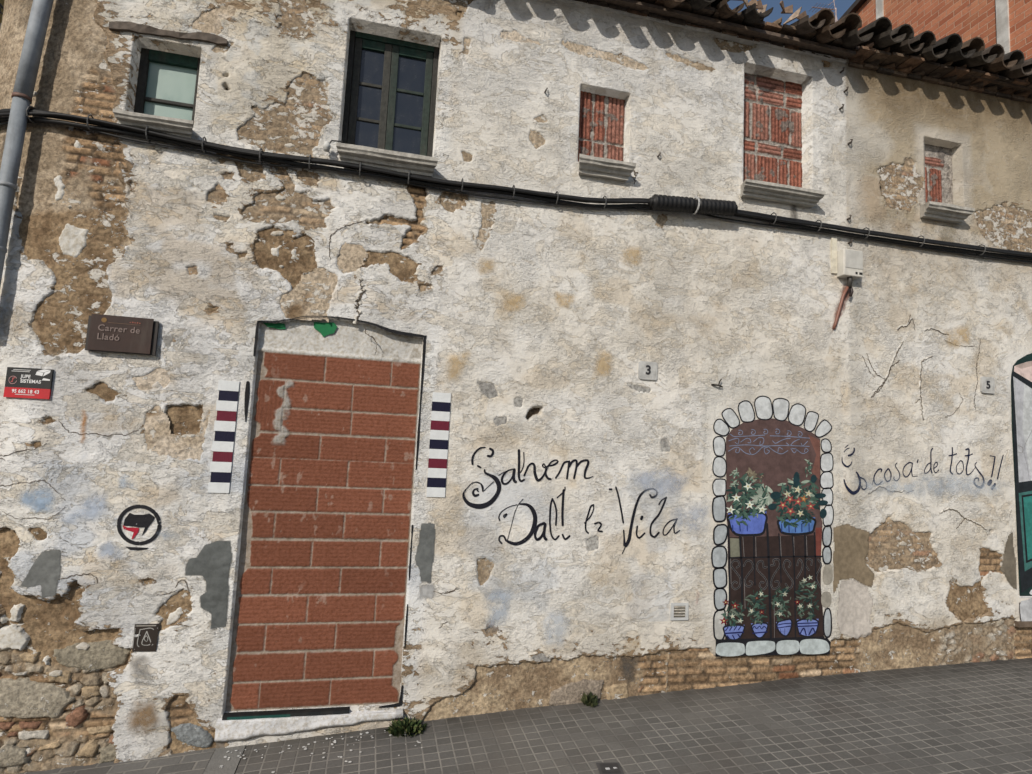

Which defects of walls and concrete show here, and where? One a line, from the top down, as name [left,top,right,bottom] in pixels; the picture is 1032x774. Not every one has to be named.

flaking render [0,0,33,168]
flaking render [17,0,135,355]
flaking render [207,73,442,322]
flaking render [440,191,464,212]
flaking render [877,158,923,212]
flaking render [974,202,1032,252]
crack [862,314,981,420]
flaking render [144,404,210,460]
flaking render [30,528,47,540]
flaking render [866,516,940,572]
flaking render [156,589,192,631]
flaking render [422,548,1032,721]